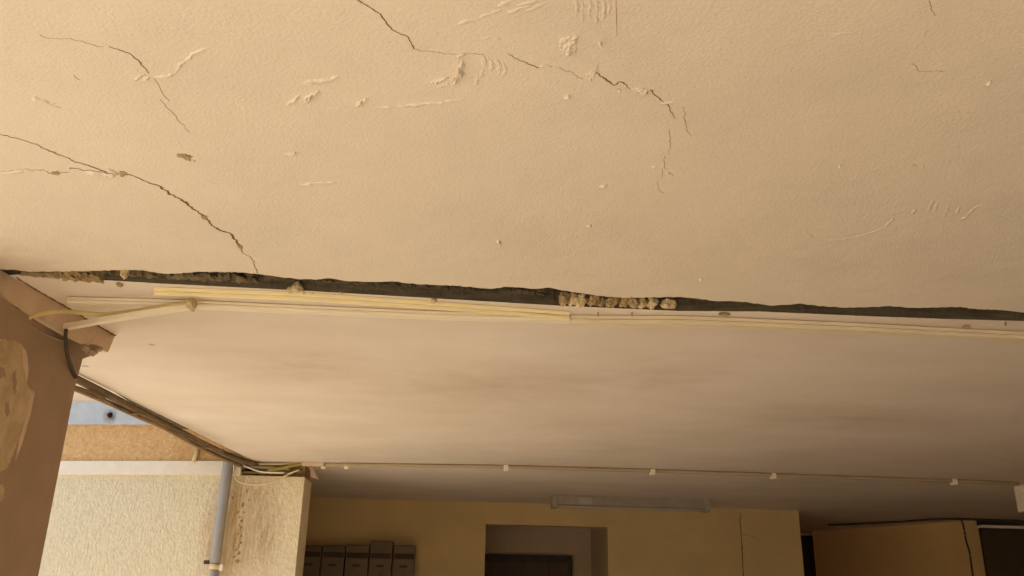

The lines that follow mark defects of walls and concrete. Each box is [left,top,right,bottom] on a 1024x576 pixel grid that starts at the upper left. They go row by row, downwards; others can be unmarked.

crack [42,36,185,127]
crack [357,0,485,55]
crack [511,55,691,193]
crack [0,134,258,273]
crack [16,277,117,336]
peeling [0,338,35,501]